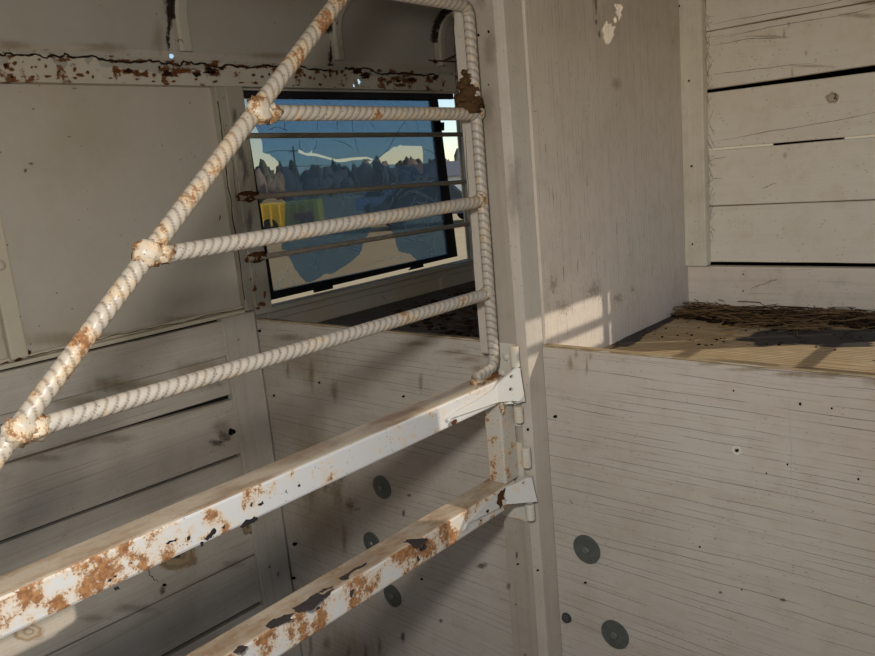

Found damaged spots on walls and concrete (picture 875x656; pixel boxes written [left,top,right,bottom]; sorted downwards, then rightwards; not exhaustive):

crack [300,10,456,85]
corrosion [4,55,94,79]
crack [0,52,278,69]
corrosion [108,59,226,83]
peeling [240,501,264,528]
corrosion [479,488,506,522]
peeling [165,525,225,547]
peeling [404,538,428,562]
peeling [265,563,367,629]